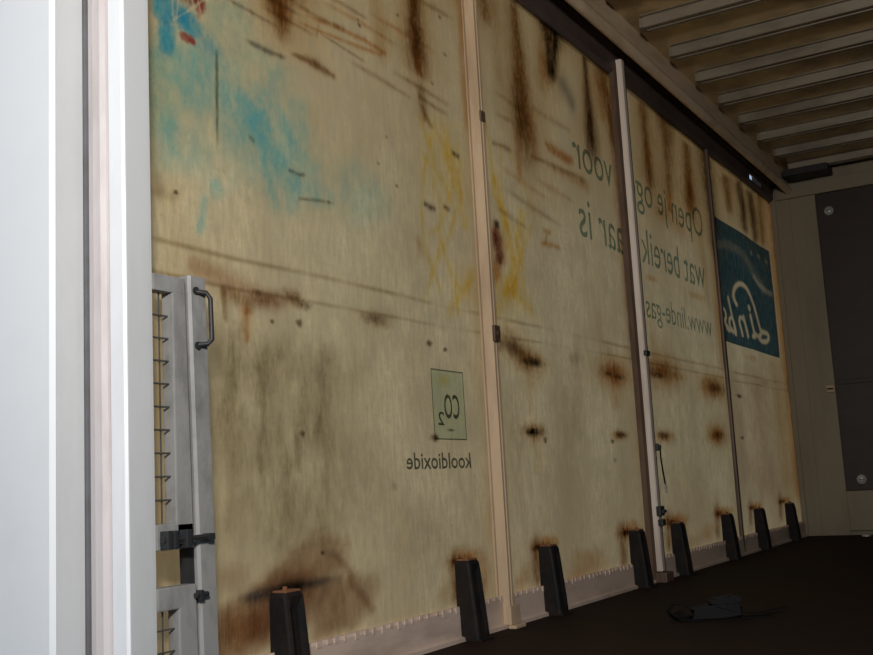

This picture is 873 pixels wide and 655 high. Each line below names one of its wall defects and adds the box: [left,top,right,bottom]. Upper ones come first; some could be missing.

rust [272,0,287,32]
rust [408,0,425,77]
rust [511,3,532,150]
rust [509,342,539,367]